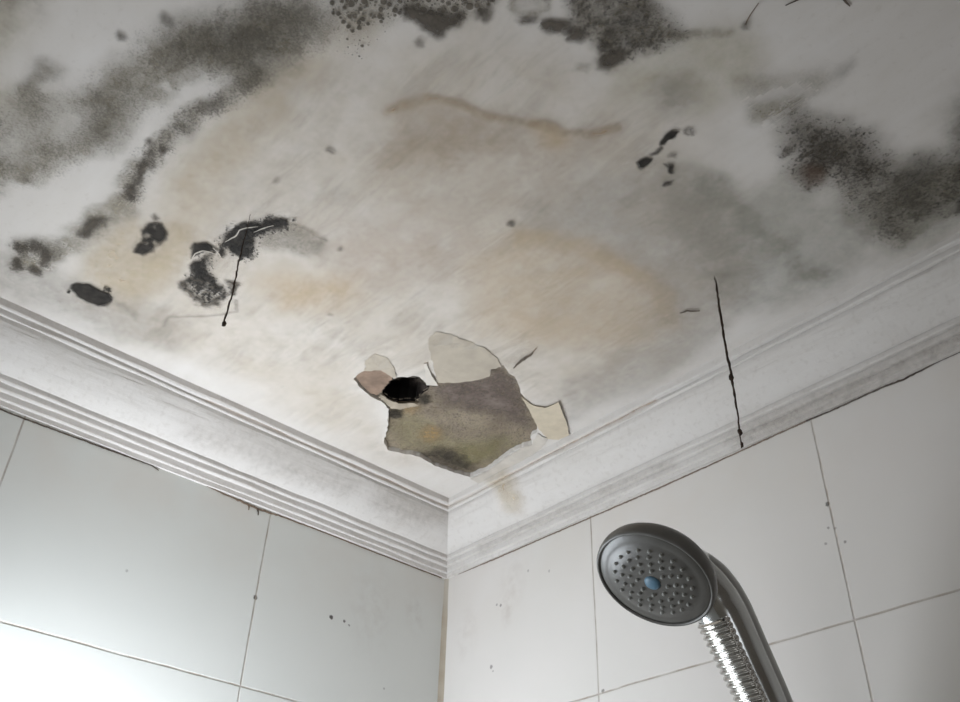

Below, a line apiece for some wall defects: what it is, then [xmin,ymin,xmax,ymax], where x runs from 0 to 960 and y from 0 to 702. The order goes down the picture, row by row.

water stain [324,0,495,57]
water stain [519,0,677,69]
water stain [10,7,319,274]
water stain [783,119,960,239]
water stain [67,284,112,306]
peeling [179,214,295,306]
spalling [356,332,569,483]
crack [207,352,960,579]